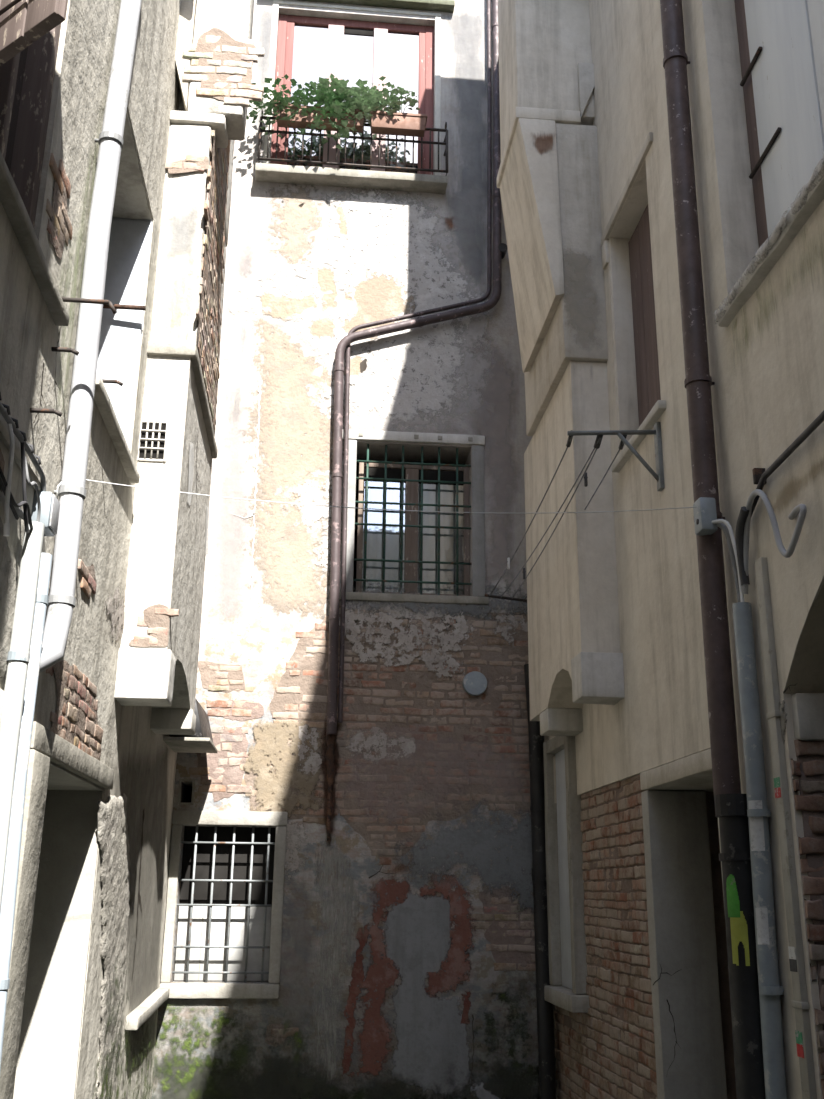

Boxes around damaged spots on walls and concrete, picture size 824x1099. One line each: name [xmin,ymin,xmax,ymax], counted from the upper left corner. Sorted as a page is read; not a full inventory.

flaking render [182,28,265,107]
flaking render [46,153,72,260]
flaking render [78,559,179,650]
spalling [165,130,536,1078]
flaking render [46,660,104,761]
rust [321,718,339,845]
water stain [115,751,168,1011]
water stain [132,846,539,1099]
crack [653,965,682,1073]